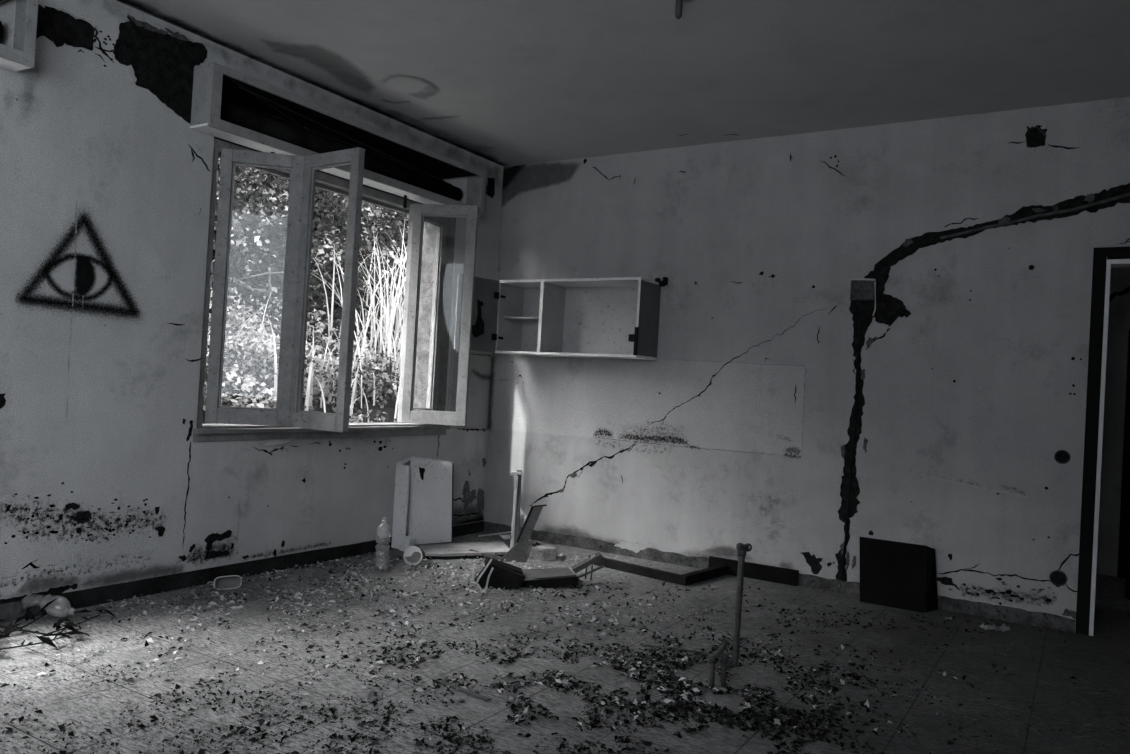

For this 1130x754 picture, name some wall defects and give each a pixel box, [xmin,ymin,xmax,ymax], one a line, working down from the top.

flaking render [36,4,94,51]
flaking render [113,14,208,124]
crack [1109,286,1130,302]
crack [529,305,838,506]
crack [938,554,1079,592]